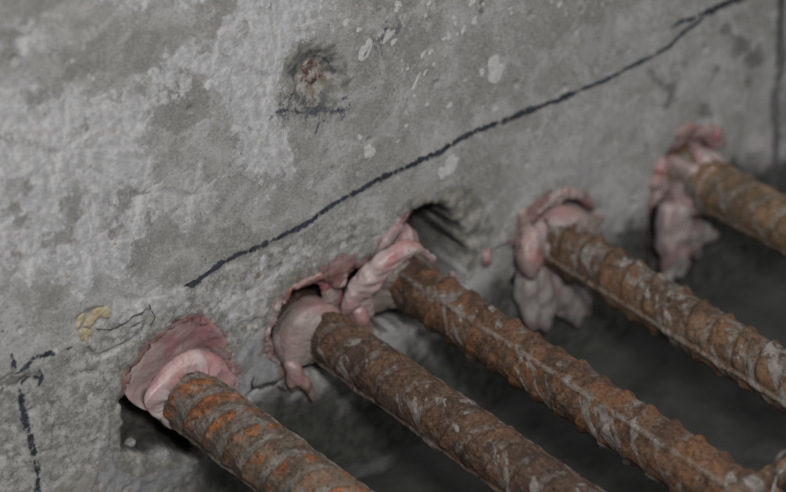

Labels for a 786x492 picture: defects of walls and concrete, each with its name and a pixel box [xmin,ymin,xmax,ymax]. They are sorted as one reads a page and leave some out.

efflorescence [0,0,342,341]
spalling [664,137,786,255]
spalling [107,371,374,492]
spalling [261,248,377,332]
spalling [310,311,605,492]
spalling [389,183,786,492]